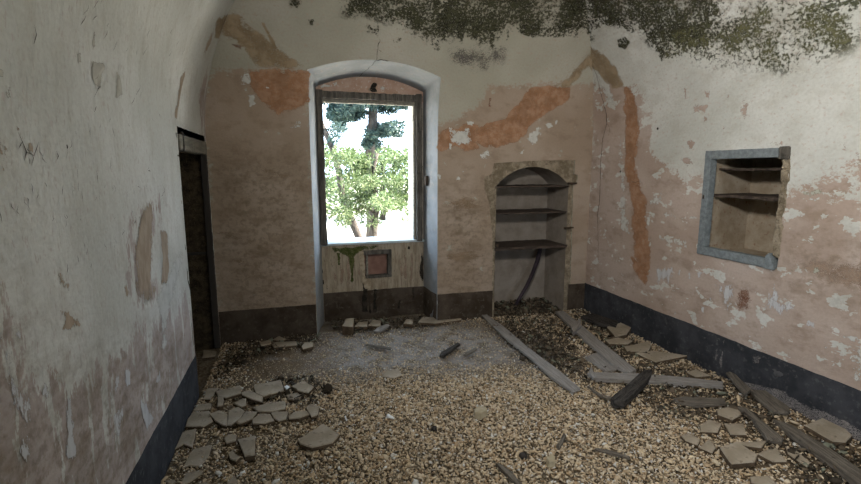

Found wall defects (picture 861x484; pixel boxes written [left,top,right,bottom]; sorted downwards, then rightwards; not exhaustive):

water stain [215,12,311,115]
peeling [449,121,474,150]
peeling [519,120,558,154]
water stain [342,0,861,284]
peeling [124,201,169,304]
water stain [337,253,377,314]
peeling [60,310,80,330]